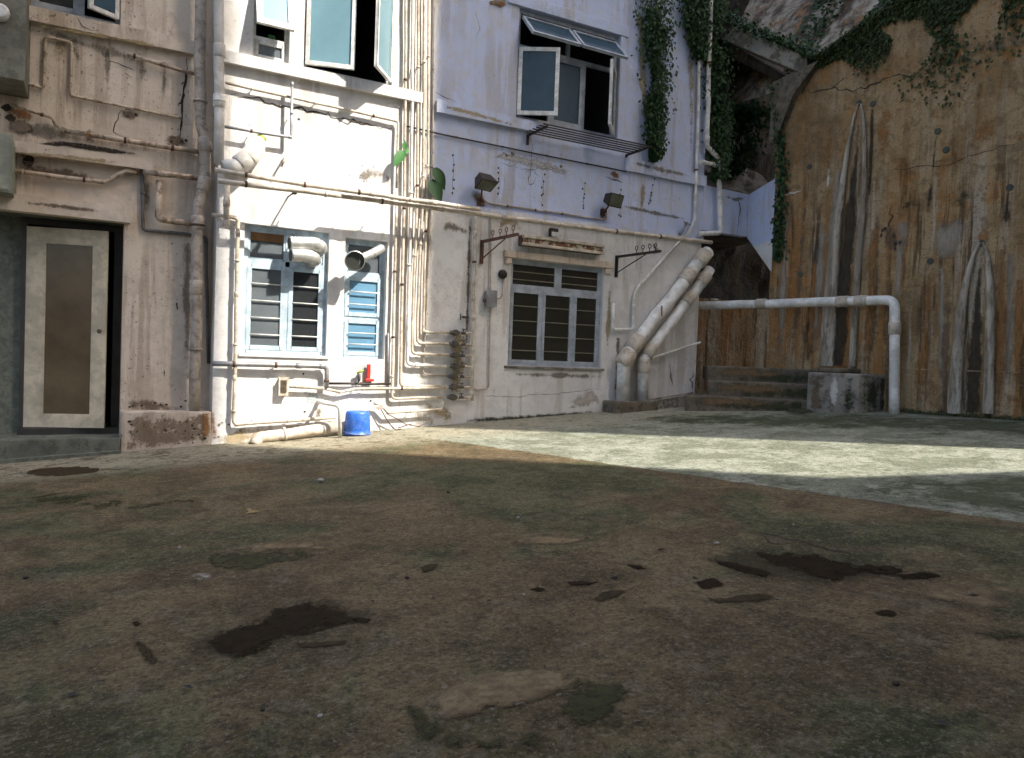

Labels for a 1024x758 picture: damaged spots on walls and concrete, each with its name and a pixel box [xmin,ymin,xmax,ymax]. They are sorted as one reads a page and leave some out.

crack [169,58,188,138]
crack [790,71,922,97]
spalling [128,415,207,449]